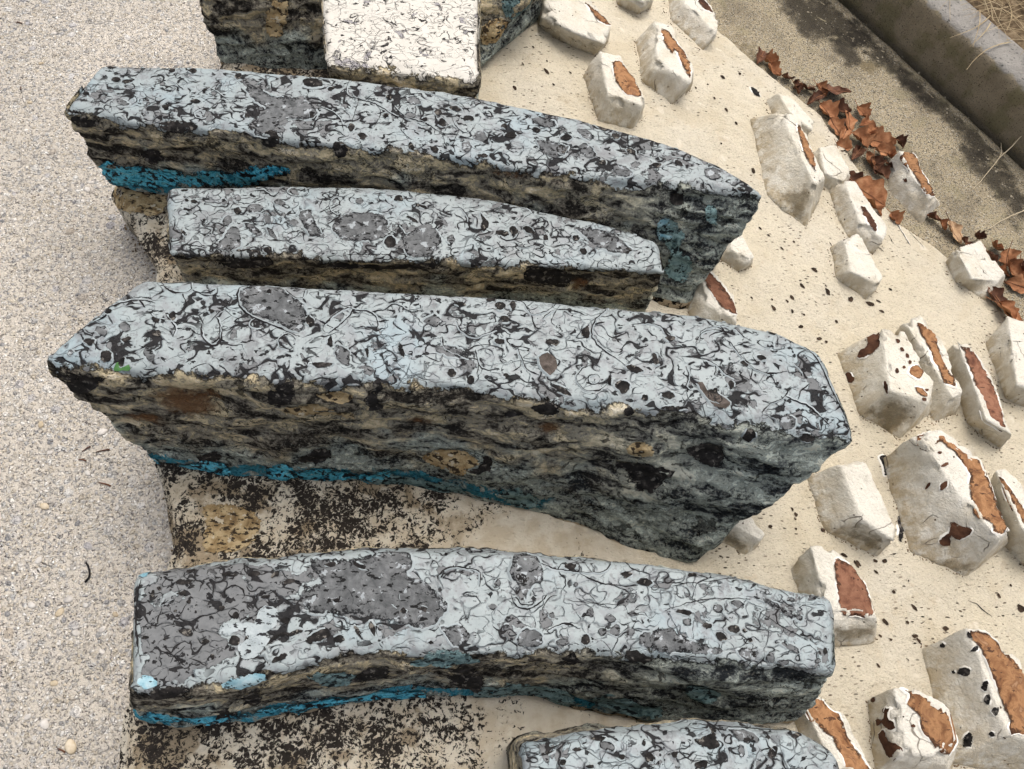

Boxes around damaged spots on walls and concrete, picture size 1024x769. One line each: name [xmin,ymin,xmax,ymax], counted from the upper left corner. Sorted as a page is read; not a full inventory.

crack [321,80,493,147]
peeling [796,124,817,172]
crack [61,282,297,351]
crack [323,297,422,333]
crack [424,321,539,375]
crack [518,300,669,392]
crack [686,325,849,424]
peeling [917,431,1024,546]
crack [135,580,205,666]
crack [511,558,806,644]
peeling [486,552,893,667]
peeling [966,629,1024,738]